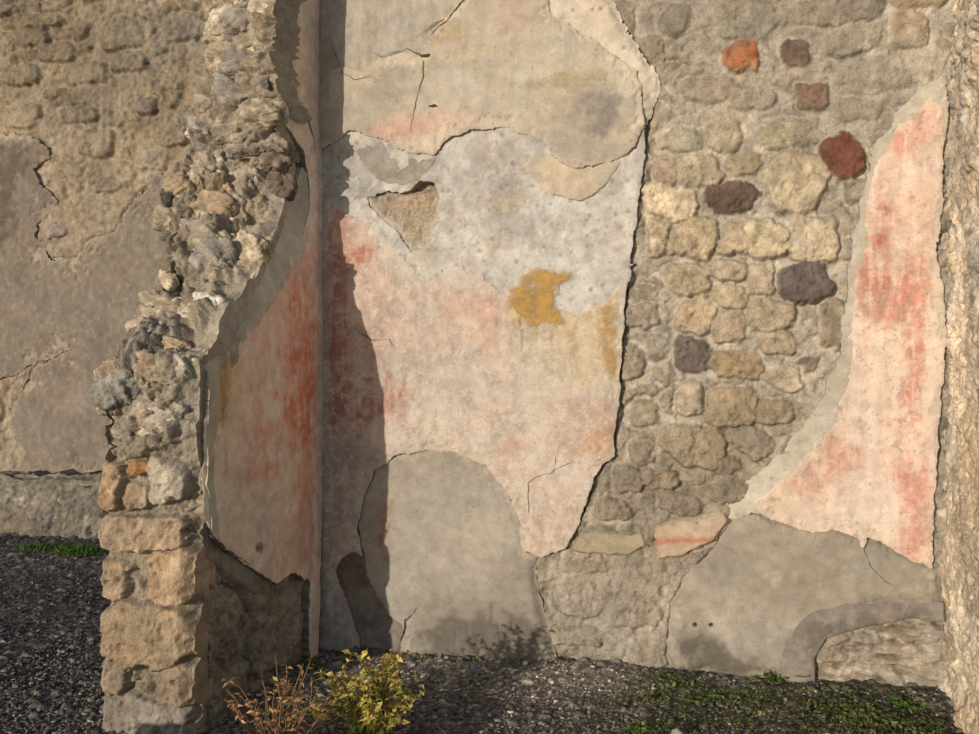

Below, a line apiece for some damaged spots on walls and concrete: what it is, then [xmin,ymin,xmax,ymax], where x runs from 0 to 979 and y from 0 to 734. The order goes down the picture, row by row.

crack [329,0,462,131]
flaking render [319,0,661,351]
flaking render [337,450,558,661]
flaking render [666,512,949,678]